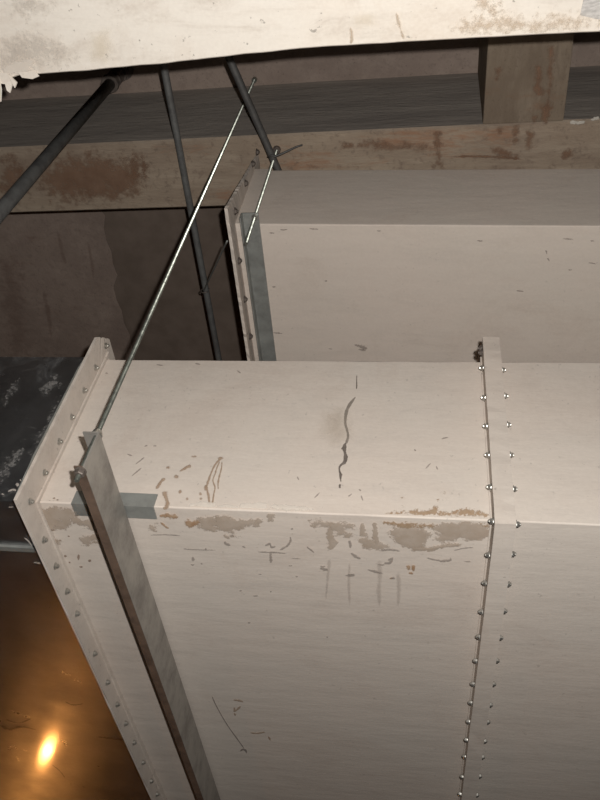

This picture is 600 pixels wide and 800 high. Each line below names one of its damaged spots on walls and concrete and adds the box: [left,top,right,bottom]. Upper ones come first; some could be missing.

crack [339,376,357,488]
peeling [189,501,312,539]
peeling [308,520,490,552]